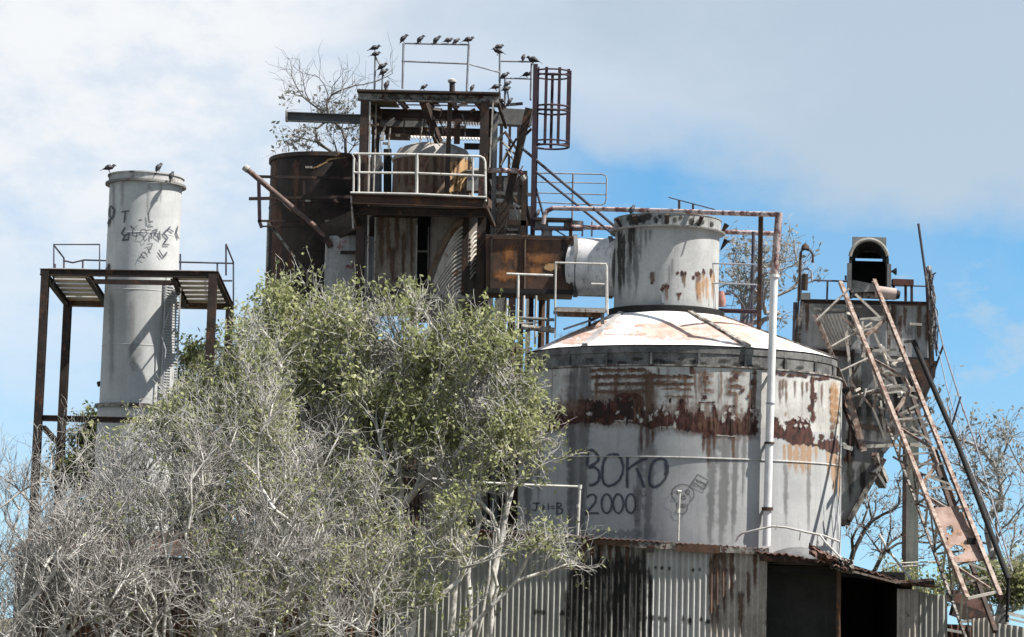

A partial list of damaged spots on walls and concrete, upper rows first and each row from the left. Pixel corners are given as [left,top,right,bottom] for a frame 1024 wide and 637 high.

corrosion [271,159,293,303]
corrosion [486,237,573,300]
leakage [617,211,714,290]
corrosion [650,269,714,300]
corrosion [557,315,807,351]
corrosion [584,366,757,462]
corrosion [775,371,839,430]
leakage [560,545,671,637]
corrosion [708,552,757,630]